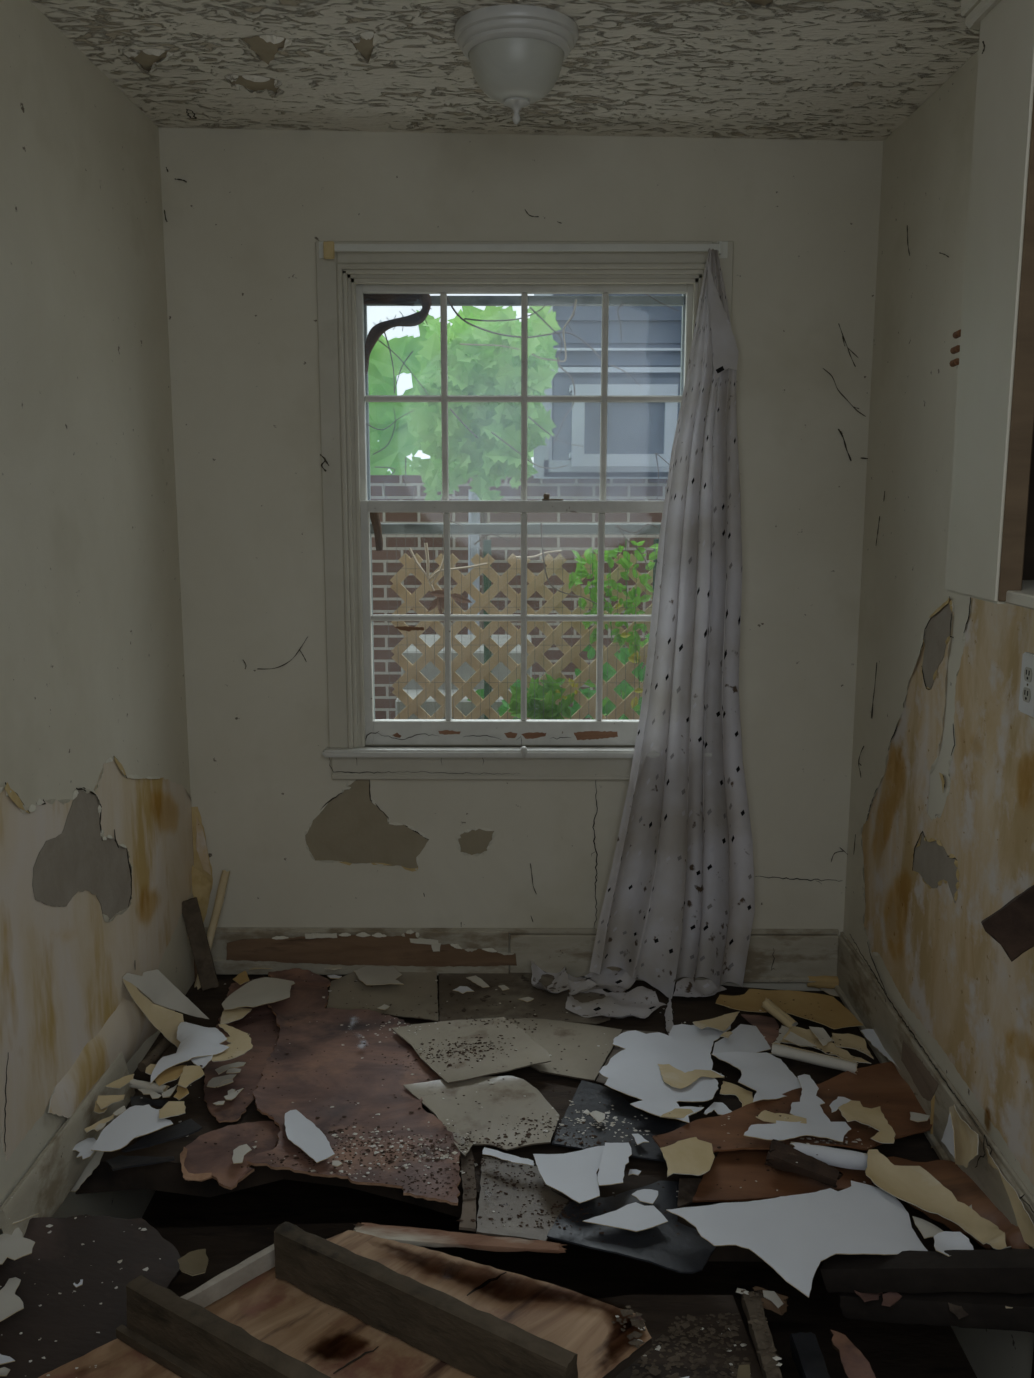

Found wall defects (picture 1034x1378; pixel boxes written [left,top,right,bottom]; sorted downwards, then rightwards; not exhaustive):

peeling [122,48,173,74]
peeling [222,35,292,98]
peeling [348,32,380,64]
peeling [860,596,1034,1186]
peeling [0,756,534,1167]